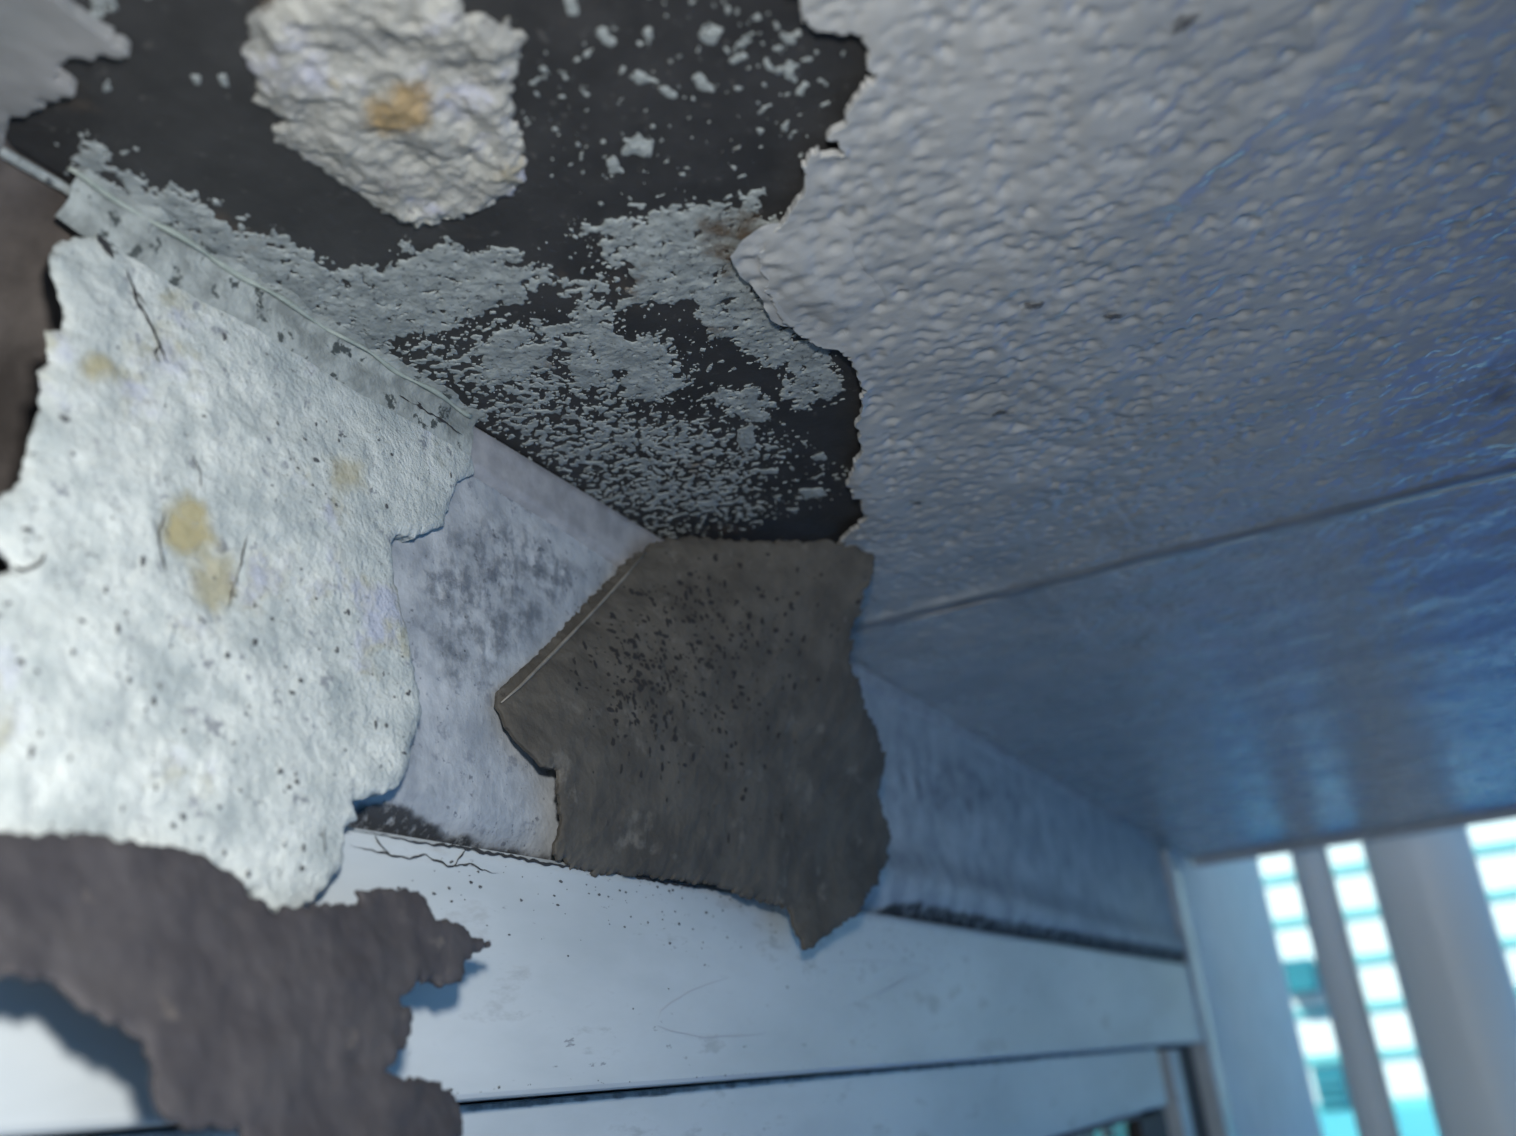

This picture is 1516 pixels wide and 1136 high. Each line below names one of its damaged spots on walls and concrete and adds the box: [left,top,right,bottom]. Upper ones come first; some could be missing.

peeling [0,0,892,1136]